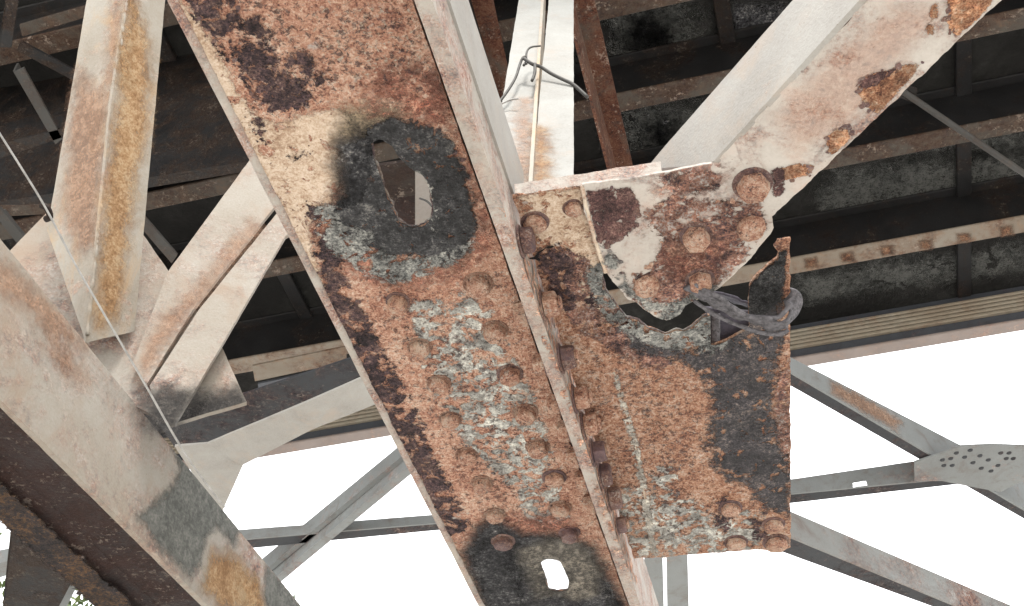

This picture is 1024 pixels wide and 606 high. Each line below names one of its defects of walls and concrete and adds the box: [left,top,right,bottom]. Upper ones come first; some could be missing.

rust [926,0,992,37]
rust [366,65,448,123]
rust [855,61,924,114]
rust [66,0,152,326]
peeling [178,0,429,287]
rust [518,118,553,181]
rust [823,124,855,154]
rust [317,153,489,288]
rust [627,163,814,315]
rust [502,230,638,585]
rust [204,553,261,606]